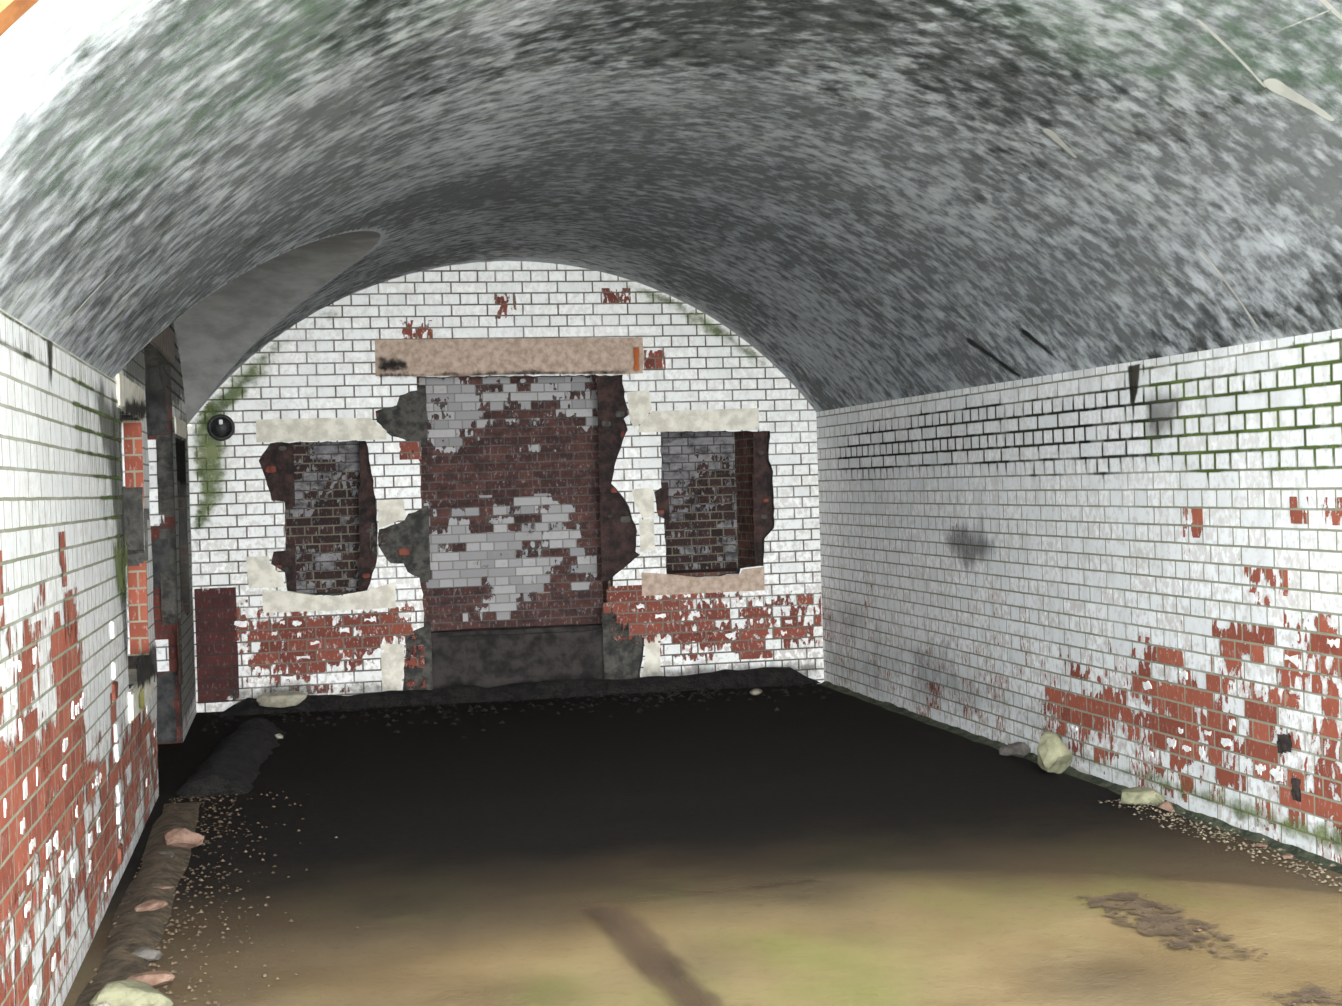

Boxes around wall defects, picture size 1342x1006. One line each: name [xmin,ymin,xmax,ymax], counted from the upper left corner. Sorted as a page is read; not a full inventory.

peeling [399,376,598,460]
water stain [0,0,1342,729]
spalling [0,531,158,1006]
spalling [194,587,425,704]
spalling [286,442,360,593]
peeling [423,493,822,661]
spalling [664,452,739,571]
spalling [1039,565,1342,831]
spalling [1183,508,1203,538]
spalling [1289,497,1342,525]